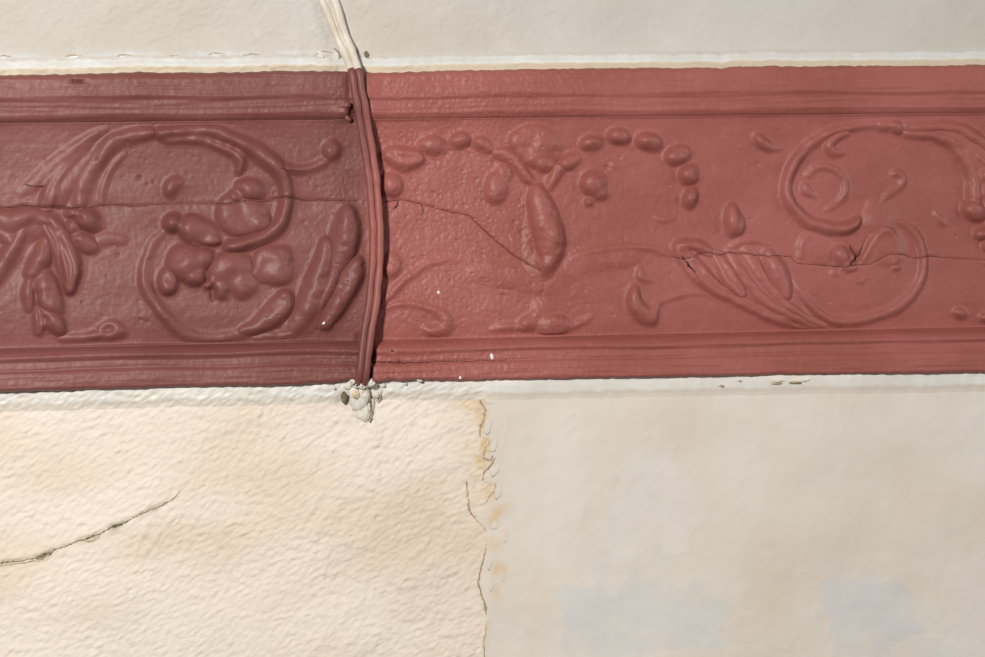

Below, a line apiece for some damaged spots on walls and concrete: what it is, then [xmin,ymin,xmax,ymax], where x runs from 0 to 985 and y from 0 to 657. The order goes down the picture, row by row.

crack [0,184,358,209]
crack [383,200,539,270]
crack [674,246,985,273]
peeling [479,398,503,503]
crack [0,492,180,569]
peeling [477,541,505,615]